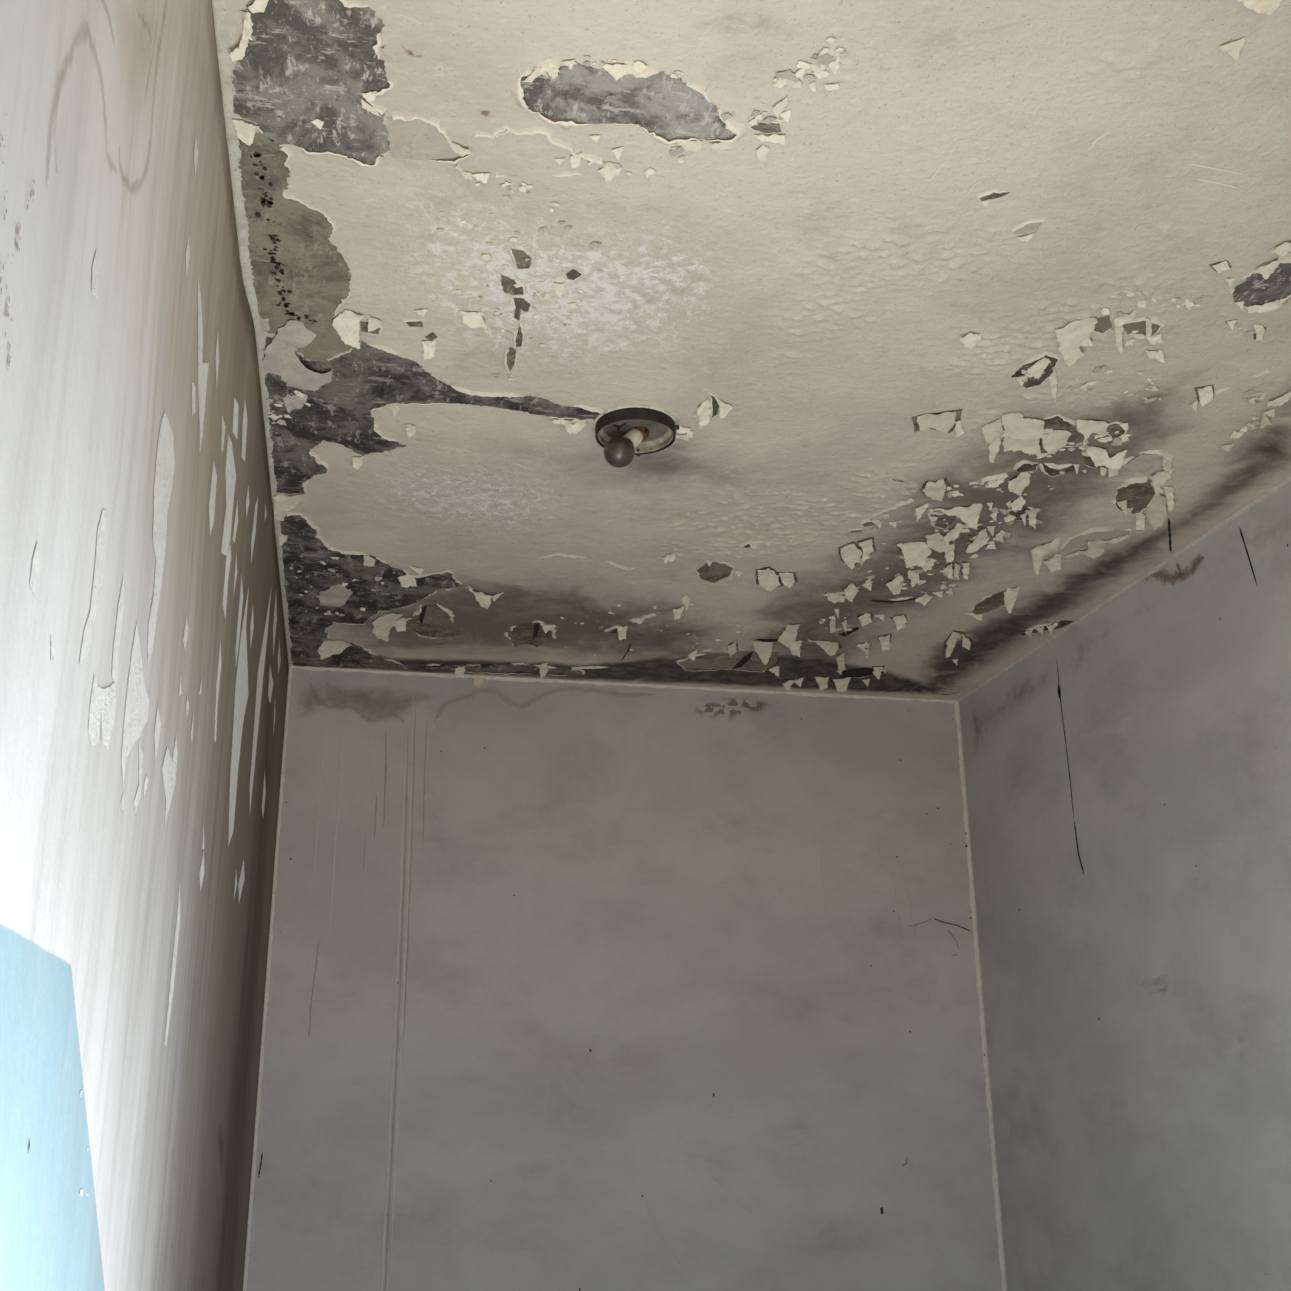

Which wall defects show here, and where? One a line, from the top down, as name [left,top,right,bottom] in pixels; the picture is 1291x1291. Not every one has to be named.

water stain [250,153,317,324]
peeling [230,0,1203,692]
peeling [1209,242,1291,341]
water stain [1223,428,1284,494]
water stain [380,410,1166,693]
water stain [1153,558,1203,581]
water stain [705,701,762,714]
crack [1057,666,1085,877]